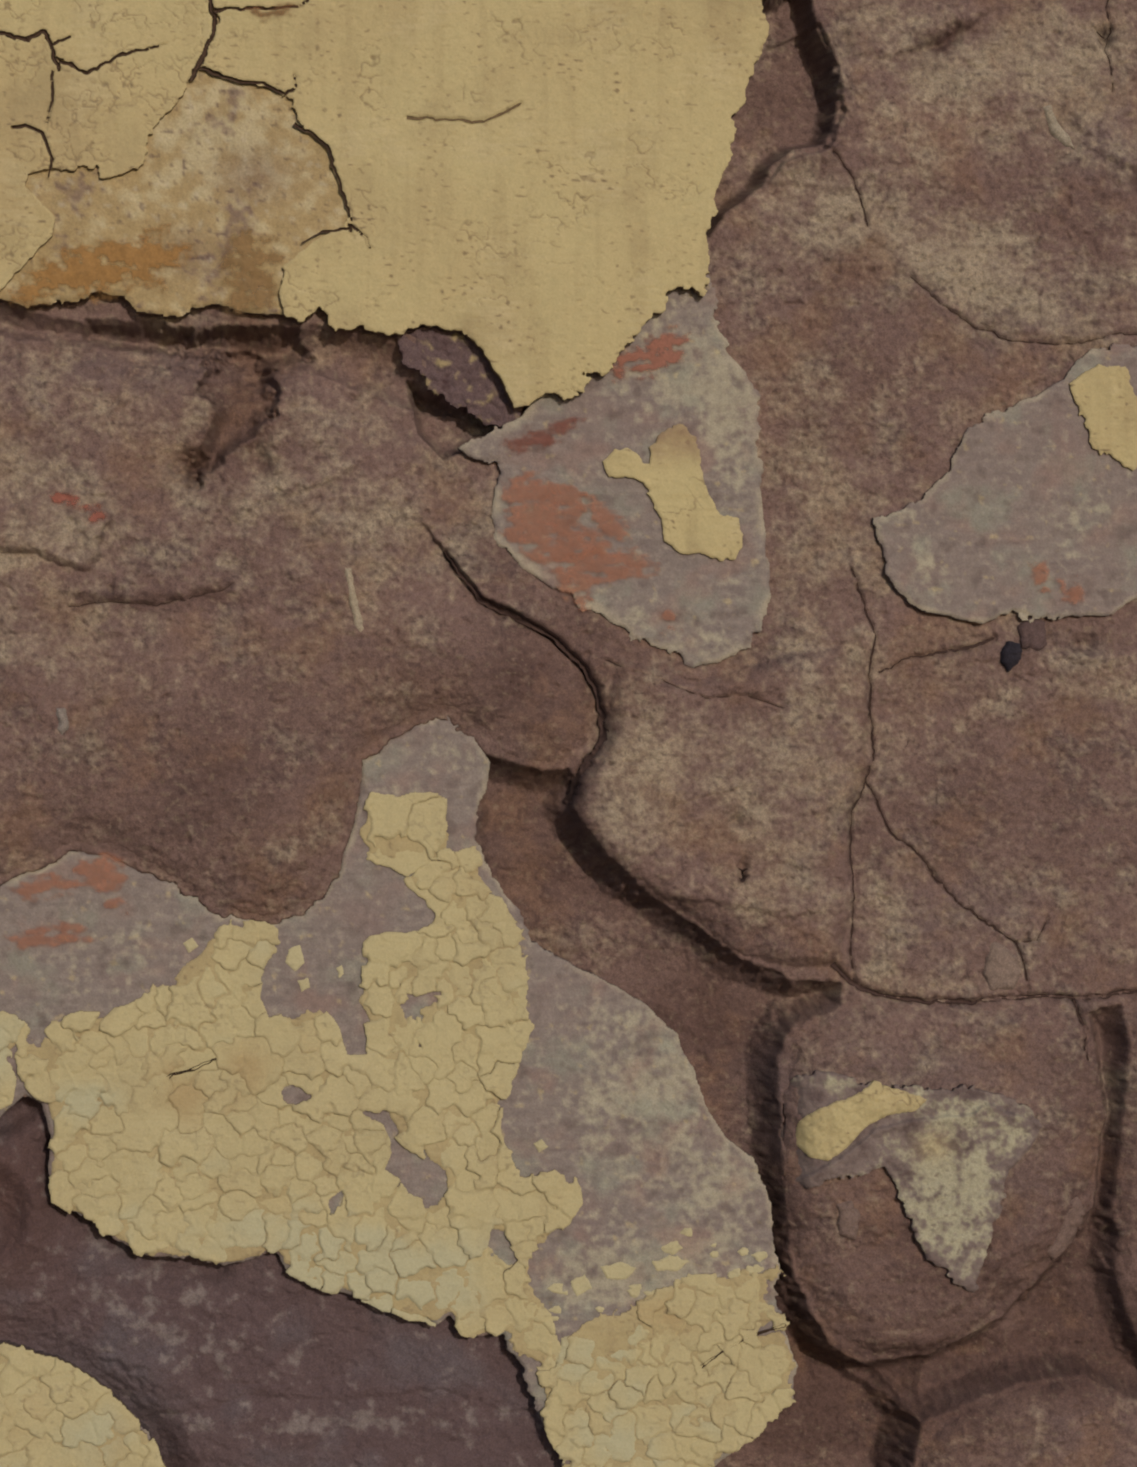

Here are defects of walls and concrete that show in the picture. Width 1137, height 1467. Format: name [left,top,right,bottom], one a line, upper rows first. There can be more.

crack [0,29,166,178]
crack [190,0,371,249]
crack [407,103,521,123]
peeling [0,0,771,668]
peeling [871,343,1137,651]
crack [444,551,621,804]
crack [663,680,783,708]
crack [831,568,1137,1061]
peeling [0,716,798,1467]
peeling [781,1070,1042,1293]